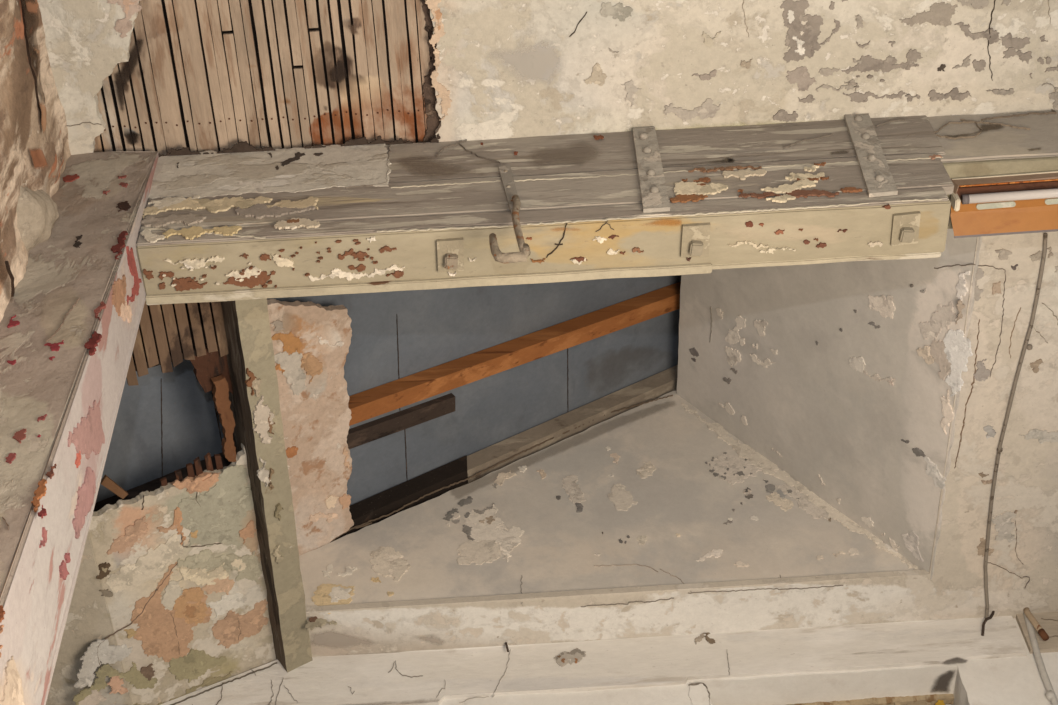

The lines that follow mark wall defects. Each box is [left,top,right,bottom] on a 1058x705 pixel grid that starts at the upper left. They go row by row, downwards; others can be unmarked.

spalling [159,141,326,170]
peeling [340,0,452,146]
peeling [670,162,863,203]
peeling [773,0,972,123]
crack [876,110,1057,139]
peeling [899,0,1058,110]
crack [546,223,568,258]
crack [934,263,1058,468]
peeling [31,464,57,548]
peeling [67,400,105,539]
peeling [73,457,275,705]
crack [388,649,511,703]